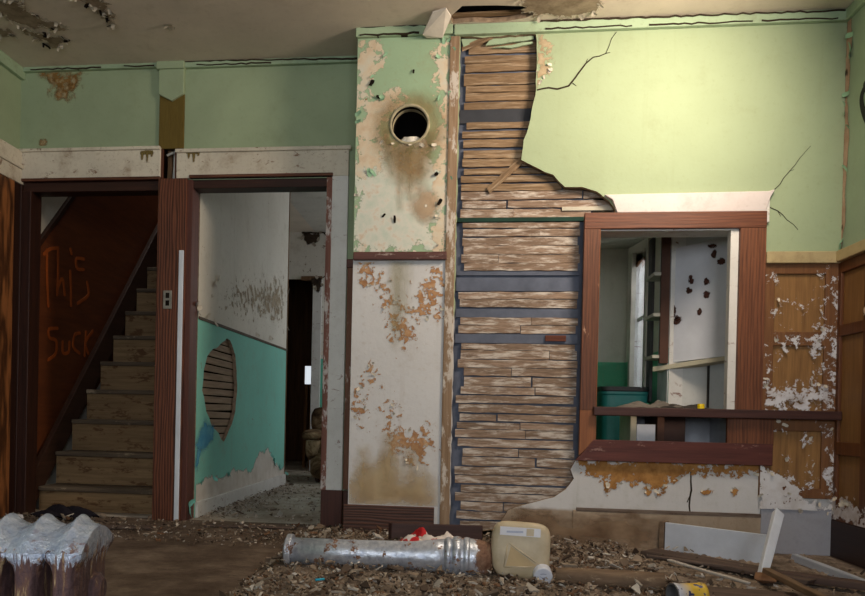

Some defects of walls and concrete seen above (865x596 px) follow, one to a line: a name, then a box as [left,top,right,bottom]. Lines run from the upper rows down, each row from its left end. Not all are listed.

peeling [0,0,73,52]
peeling [69,0,116,29]
peeling [514,0,604,23]
crack [537,9,846,91]
crack [770,148,809,230]
flaking render [350,19,865,530]
flaking render [202,340,234,440]
peeling [188,448,289,517]
leakage [349,451,433,506]